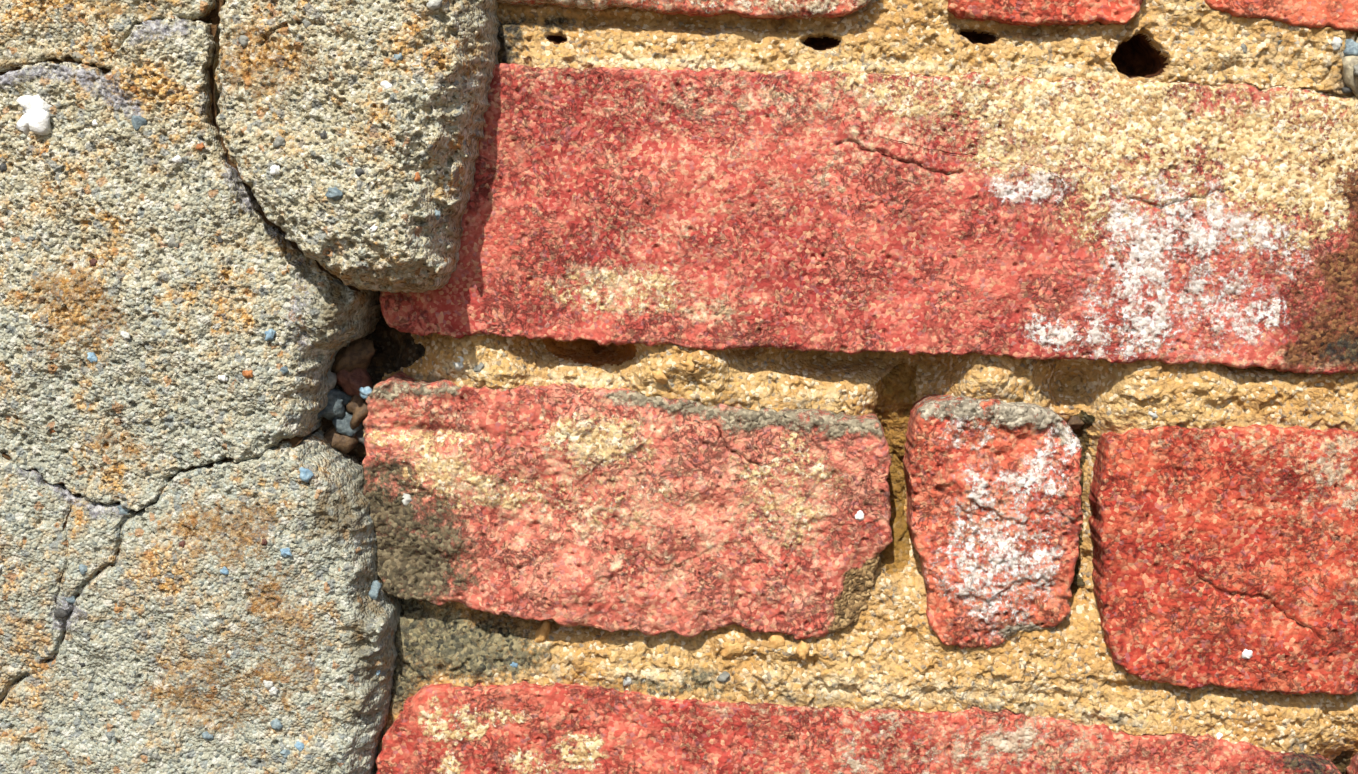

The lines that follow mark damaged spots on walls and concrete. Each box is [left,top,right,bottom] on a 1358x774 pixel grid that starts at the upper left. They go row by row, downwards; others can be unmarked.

crack [0,58,111,75]
crack [160,0,361,291]
damp [538,266,683,314]
damp [814,70,1358,374]
crack [0,451,146,703]
crack [169,457,233,479]
crack [277,436,303,448]
damp [915,395,1081,638]